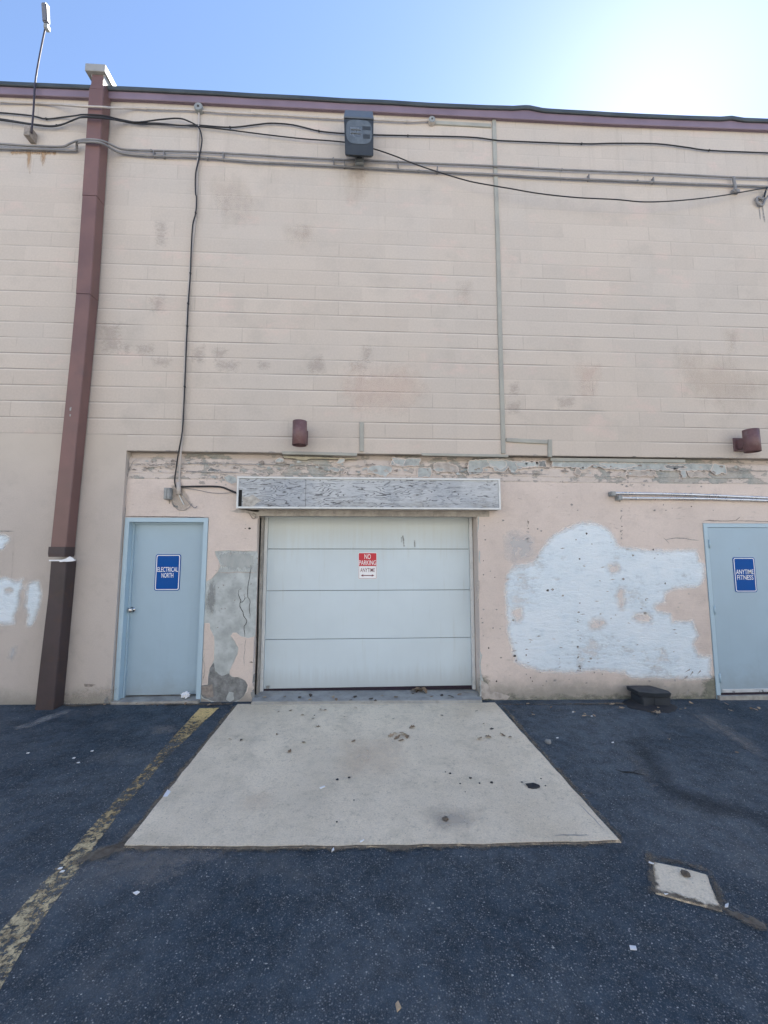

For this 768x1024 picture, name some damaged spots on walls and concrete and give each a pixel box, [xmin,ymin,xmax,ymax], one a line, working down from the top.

peeling [256,451,745,487]
peeling [201,549,258,702]
crack [238,565,251,654]